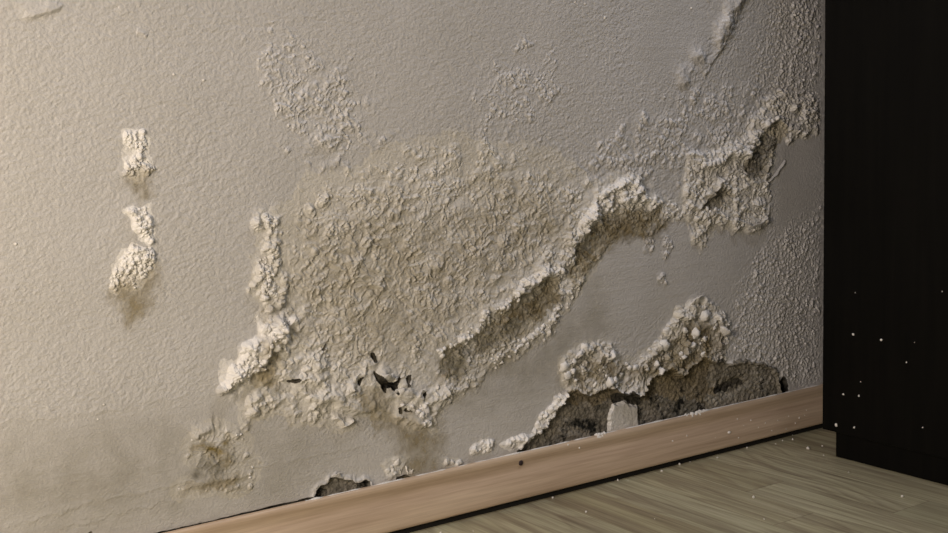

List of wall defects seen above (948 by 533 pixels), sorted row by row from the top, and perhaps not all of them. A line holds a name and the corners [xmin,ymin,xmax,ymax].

peeling [426,89,820,411]
flaking render [517,358,789,452]
flaking render [315,473,371,497]